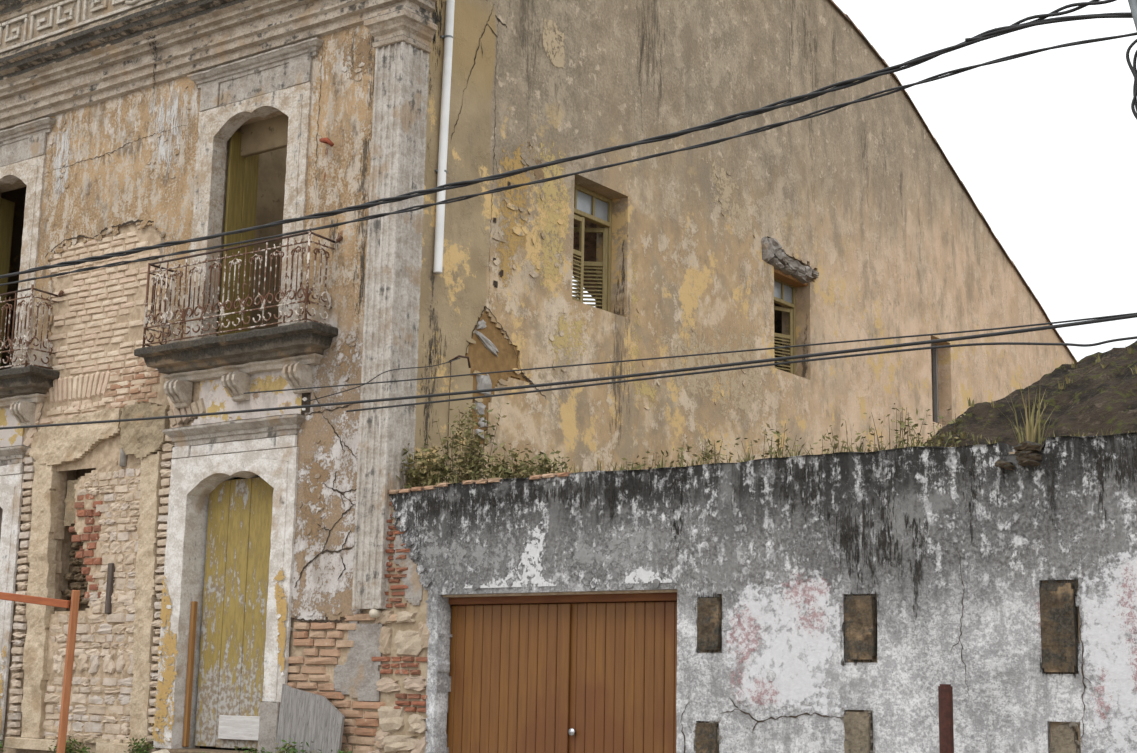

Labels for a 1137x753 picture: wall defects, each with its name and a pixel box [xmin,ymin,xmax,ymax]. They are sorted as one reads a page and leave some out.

crack [451,4,546,398]
peeling [492,139,570,302]
spalling [23,219,206,474]
spalling [56,434,141,611]
spalling [273,502,557,753]
water stain [670,475,689,553]
water stain [778,462,930,636]
water stain [961,451,983,545]
water stain [1046,449,1058,530]
water stain [1080,438,1137,520]
crack [719,700,844,732]